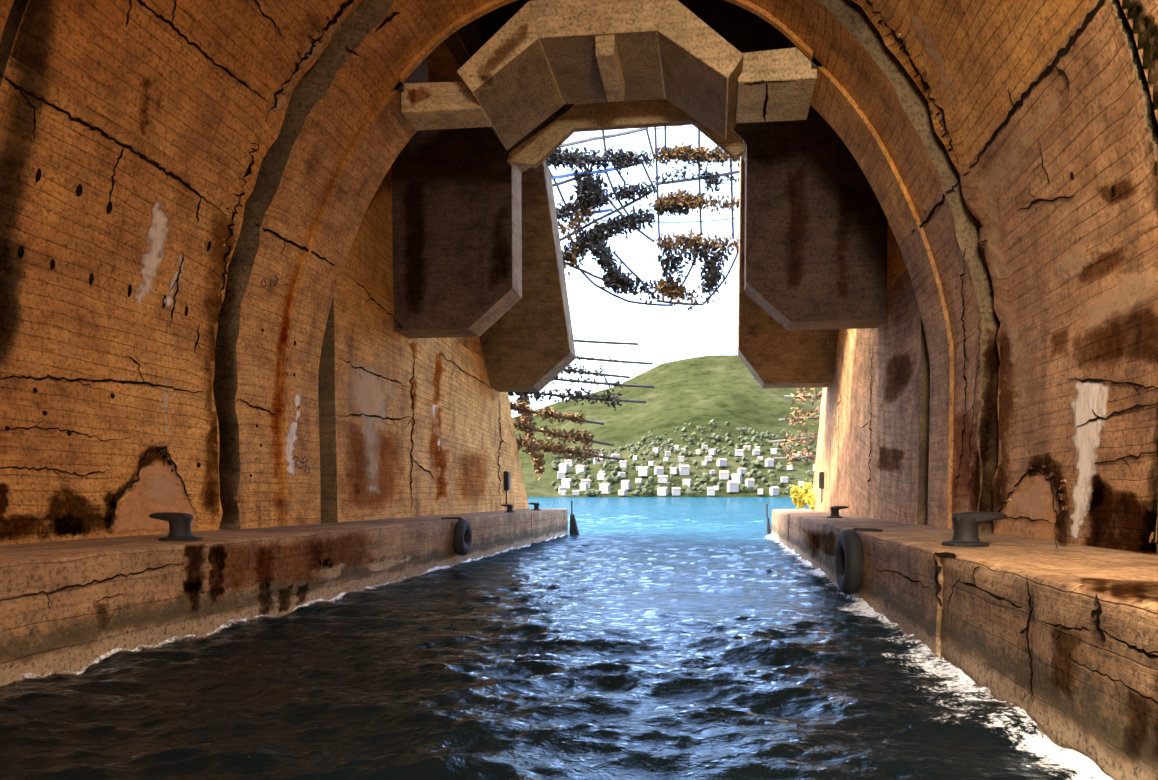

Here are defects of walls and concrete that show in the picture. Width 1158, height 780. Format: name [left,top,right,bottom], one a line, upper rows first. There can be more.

crack [0,73,227,224]
crack [911,0,1115,236]
damp [0,484,118,540]
crack [0,355,205,393]
spalling [110,446,197,534]
damp [184,545,227,611]
damp [259,581,309,615]
crack [254,223,505,513]
corrosion [431,355,446,496]
crack [876,566,1158,705]
damp [1070,381,1158,554]
damp [1081,577,1158,601]